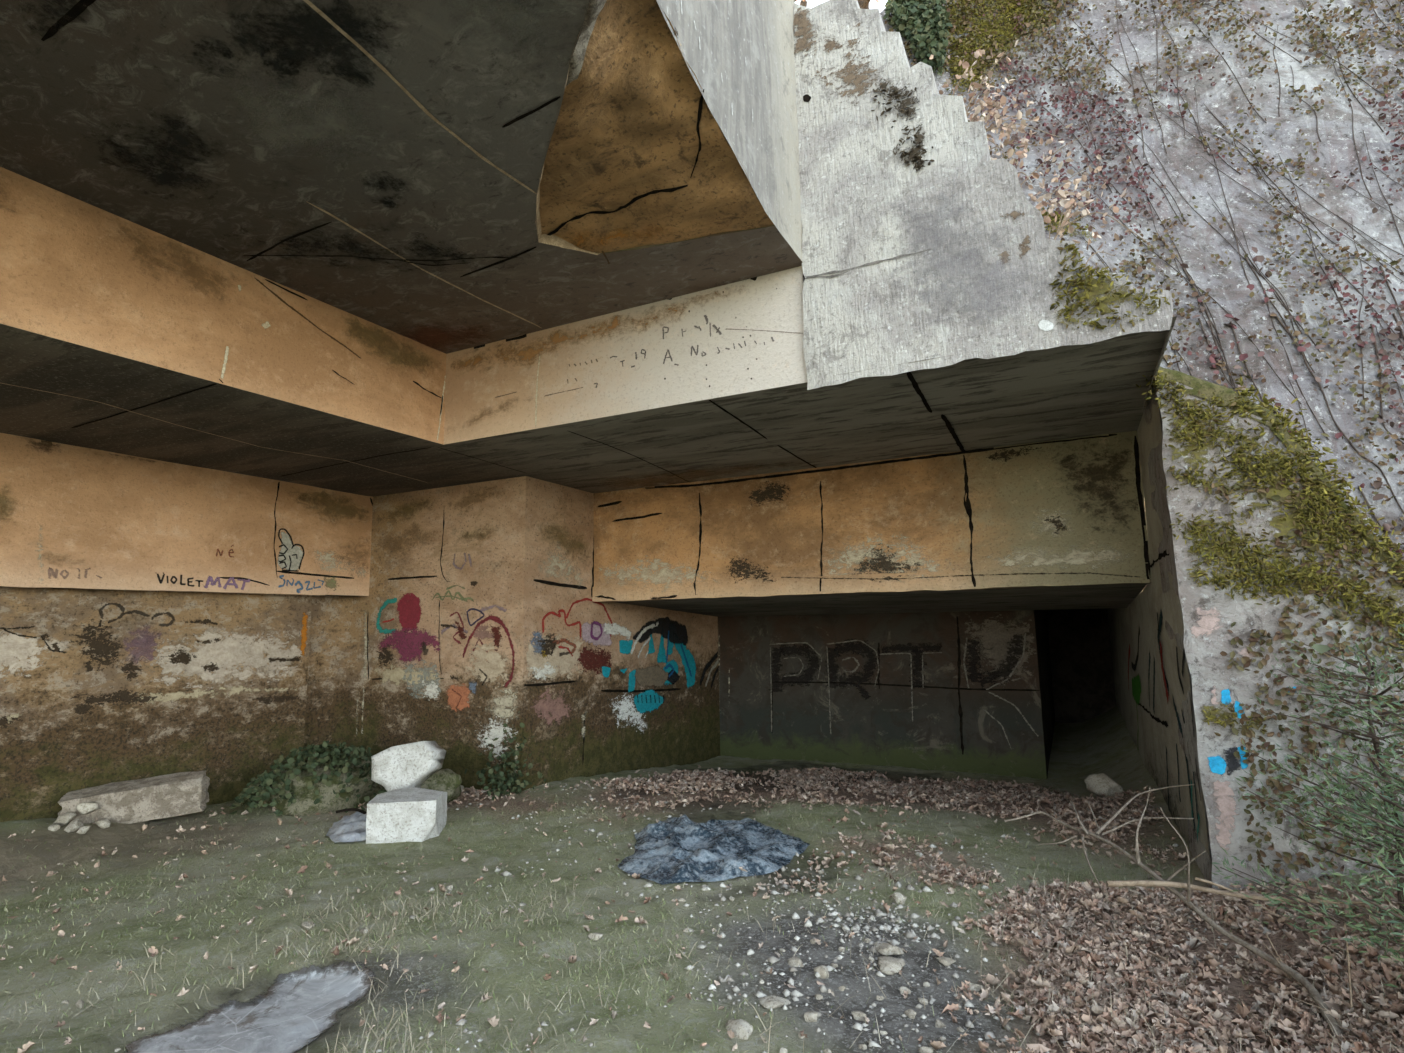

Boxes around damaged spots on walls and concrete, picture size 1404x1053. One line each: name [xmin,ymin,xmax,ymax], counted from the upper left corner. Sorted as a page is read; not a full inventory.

water stain [193,0,394,86]
water stain [99,115,217,198]
crack [547,89,704,235]
spalling [535,0,774,255]
crack [243,255,516,385]
crack [591,539,616,600]
crack [651,493,702,599]
water stain [726,556,776,584]
water stain [828,535,940,582]
crack [781,455,1171,591]
peeling [0,619,303,715]
spalling [0,713,23,727]